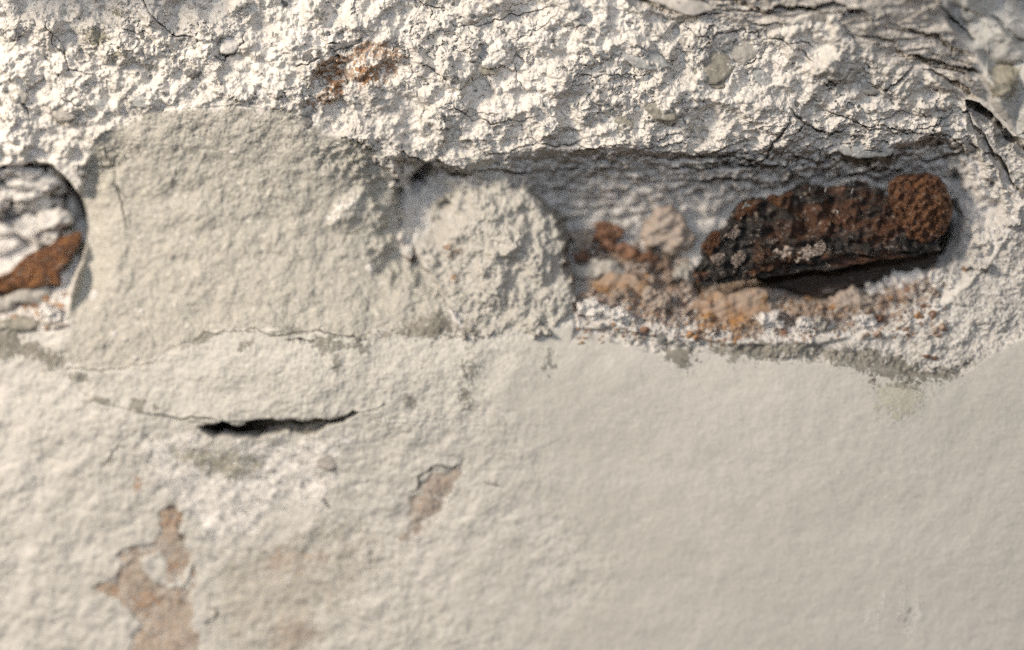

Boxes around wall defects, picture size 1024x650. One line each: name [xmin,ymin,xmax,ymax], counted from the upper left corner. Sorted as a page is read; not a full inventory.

crack [122,0,190,37]
crack [213,30,245,61]
crack [418,0,588,38]
crack [683,20,813,65]
corrosion [302,36,417,110]
crack [394,105,627,188]
crack [664,108,950,162]
spalling [0,0,1024,379]
corrosion [732,192,795,222]
corrosion [0,231,82,293]
corrosion [562,228,933,347]
crack [148,411,357,434]